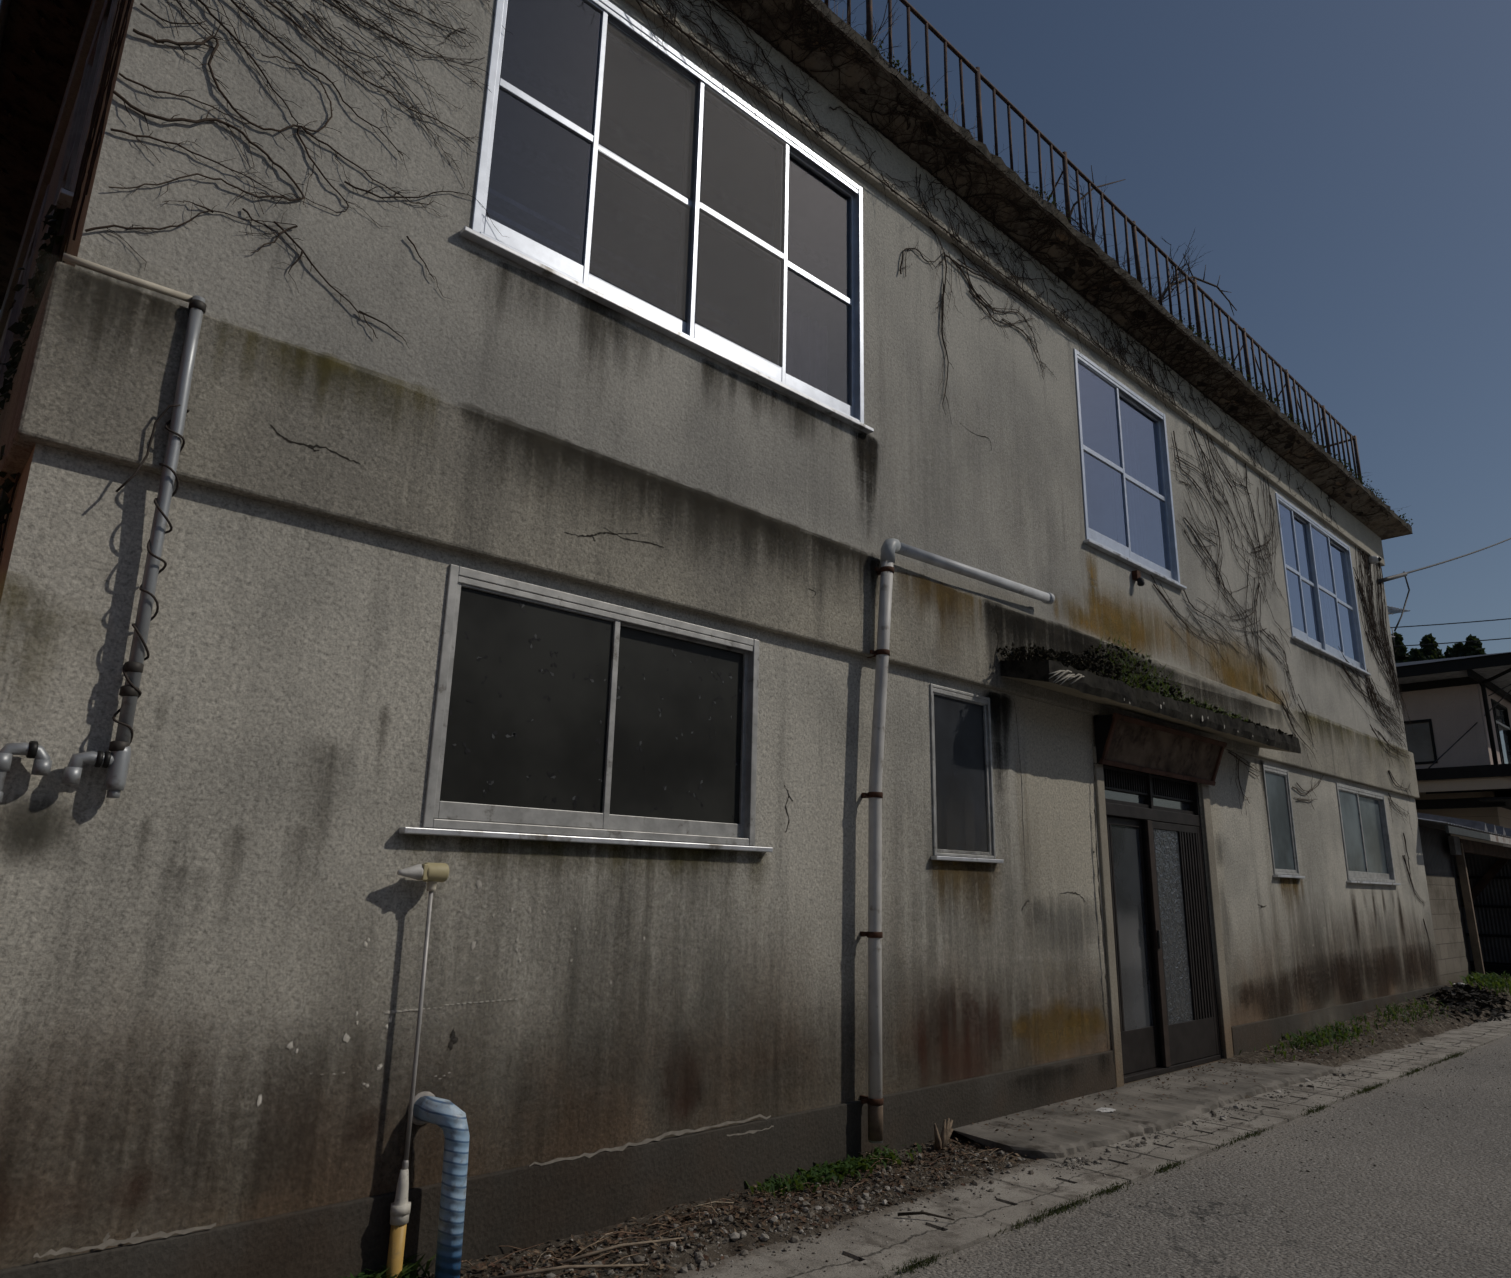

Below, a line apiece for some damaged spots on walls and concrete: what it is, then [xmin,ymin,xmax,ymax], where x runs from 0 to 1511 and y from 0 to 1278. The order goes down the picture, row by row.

damp [504,419,880,578]
crack [529,1114,774,1167]